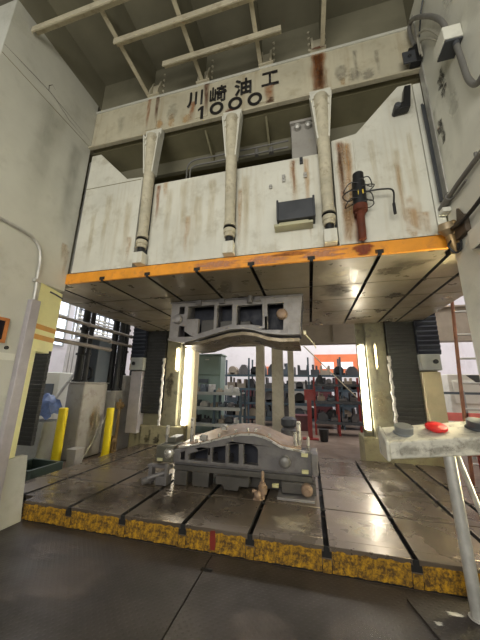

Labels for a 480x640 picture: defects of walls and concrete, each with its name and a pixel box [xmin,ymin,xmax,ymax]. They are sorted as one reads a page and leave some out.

rust [312,46,325,88]
rust [337,143,358,227]
rust [354,236,373,255]